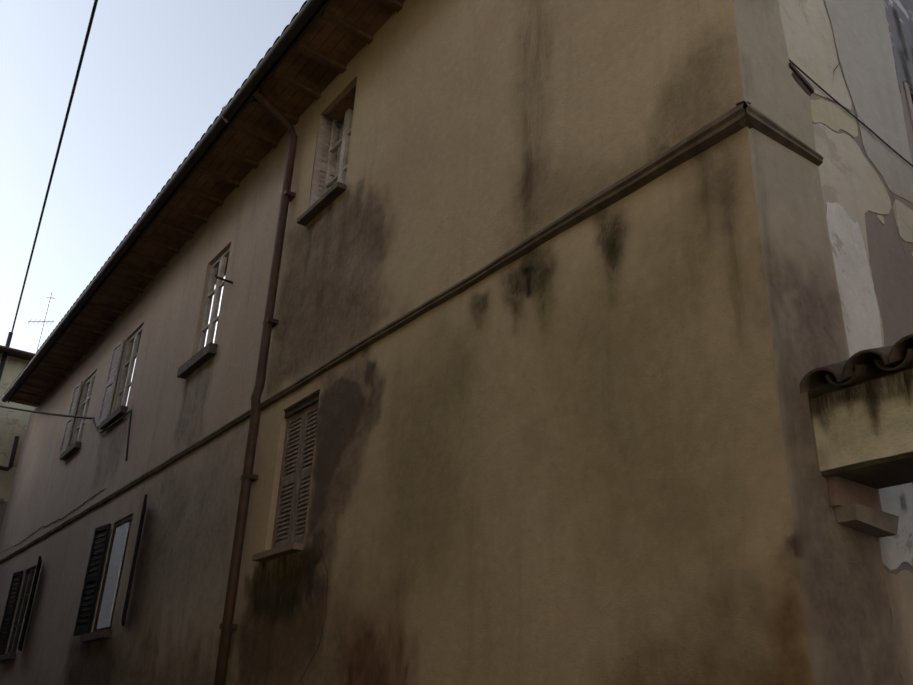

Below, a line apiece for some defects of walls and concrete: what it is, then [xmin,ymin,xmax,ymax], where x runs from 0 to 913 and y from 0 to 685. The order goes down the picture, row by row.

peeling [778,0,913,357]
damp [798,364,913,439]
peeling [879,483,913,685]